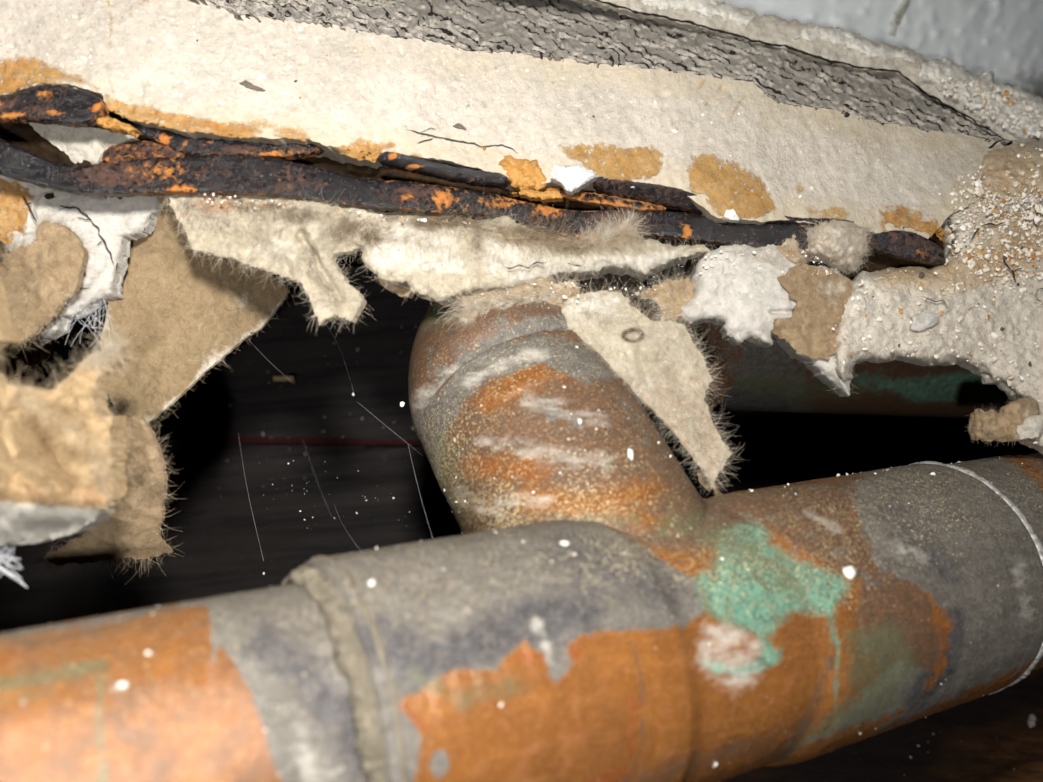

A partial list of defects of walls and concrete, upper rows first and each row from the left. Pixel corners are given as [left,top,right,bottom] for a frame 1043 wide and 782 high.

rust [96,100,264,138]
rust [338,139,394,163]
rust [499,155,563,203]
peeling [546,164,666,212]
rust [563,143,662,180]
rust [687,154,775,219]
rust [0,178,32,244]
spalling [722,209,739,223]
peeling [766,216,854,226]
rust [881,206,946,242]
peeling [377,275,415,299]
flaking render [1016,414,1043,439]